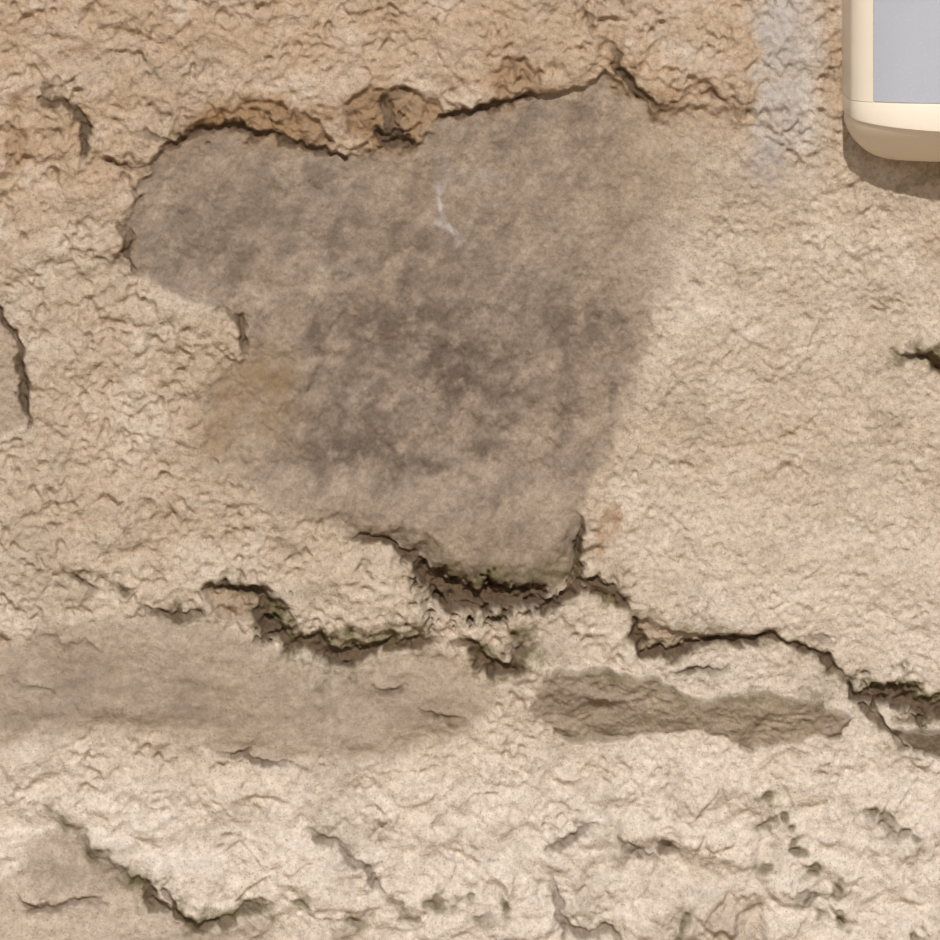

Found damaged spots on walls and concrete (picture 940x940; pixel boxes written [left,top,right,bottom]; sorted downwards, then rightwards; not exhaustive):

spalling [490,56,542,100]
spalling [188,99,335,148]
spalling [342,83,444,153]
leakage [436,186,455,234]
crack [0,303,34,430]
crack [889,337,940,375]
crack [34,631,101,655]
crack [59,512,940,753]
crack [11,679,57,696]
crack [216,746,294,770]